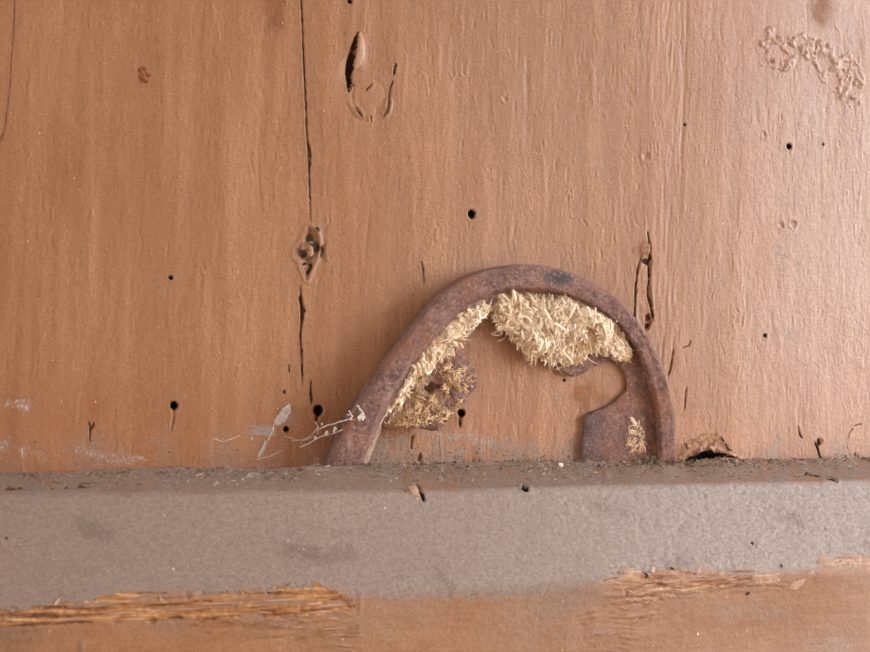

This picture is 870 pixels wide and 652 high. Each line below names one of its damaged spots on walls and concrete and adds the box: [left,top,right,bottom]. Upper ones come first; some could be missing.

crack [300,0,312,227]
crack [283,287,313,404]
corrosion [324,264,676,467]
peeling [679,433,739,465]
peeling [0,583,357,652]
peeling [602,553,870,623]